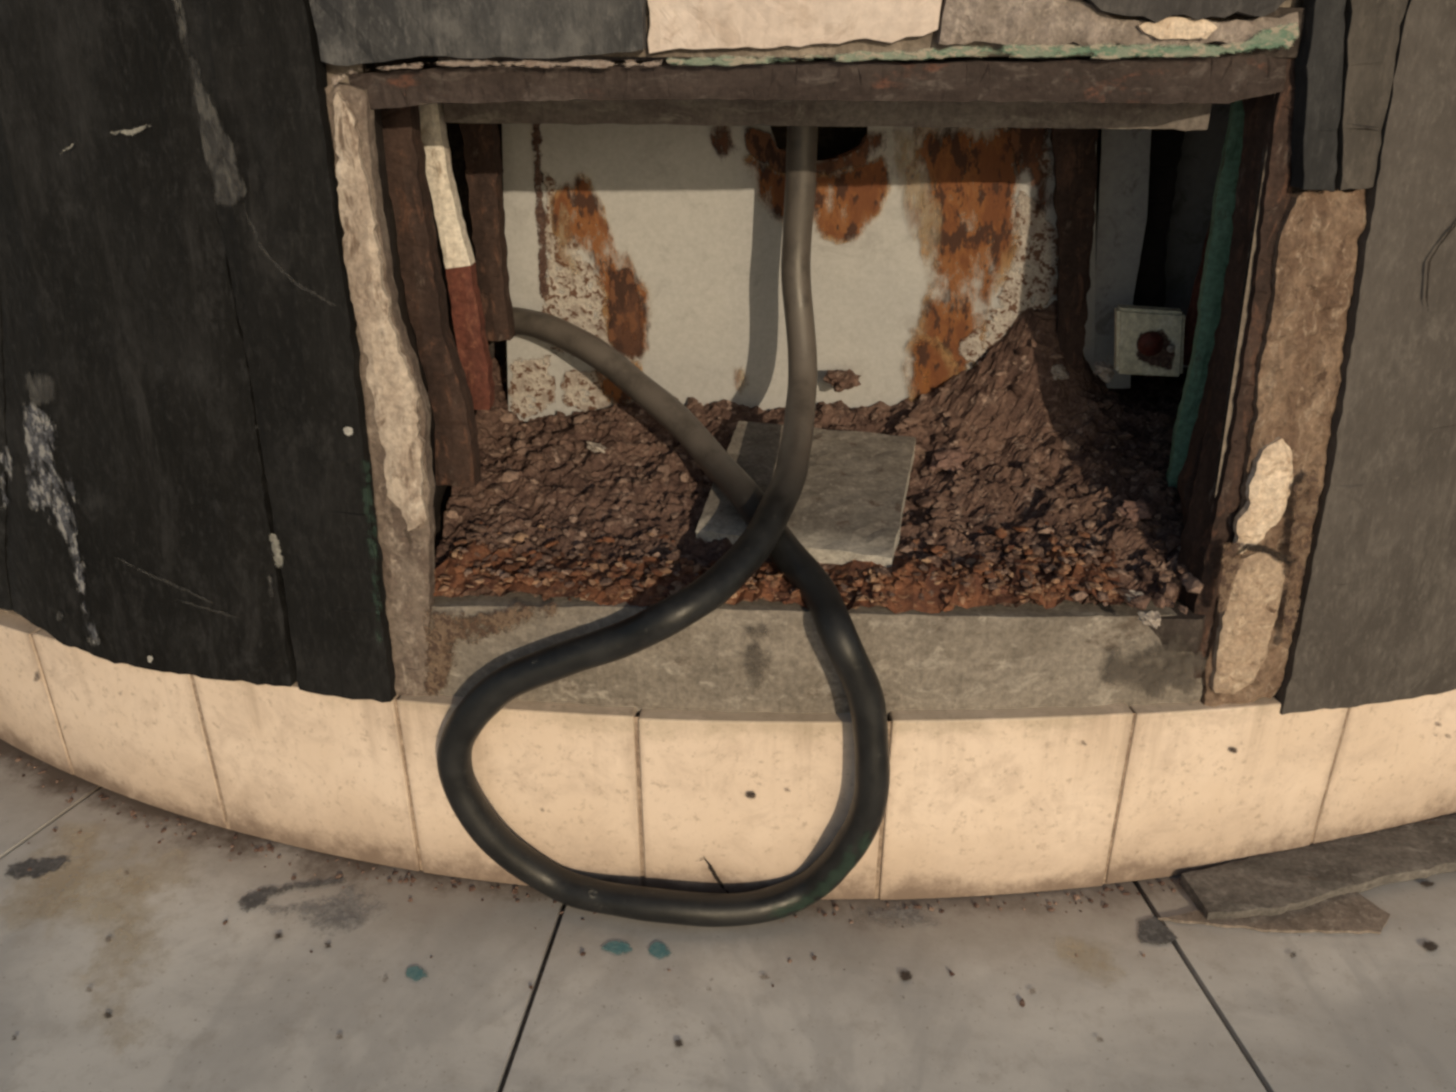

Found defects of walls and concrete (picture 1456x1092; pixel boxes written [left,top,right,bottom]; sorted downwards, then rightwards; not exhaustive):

peeling [333,91,429,531]
peeling [508,346,611,419]
peeling [542,175,611,345]
corrosion [531,124,648,371]
corrosion [596,370,632,406]
corrosion [710,126,786,220]
corrosion [814,127,1052,401]
peeling [959,135,1059,371]
spalling [1200,189,1366,707]
crack [1425,223,1456,310]